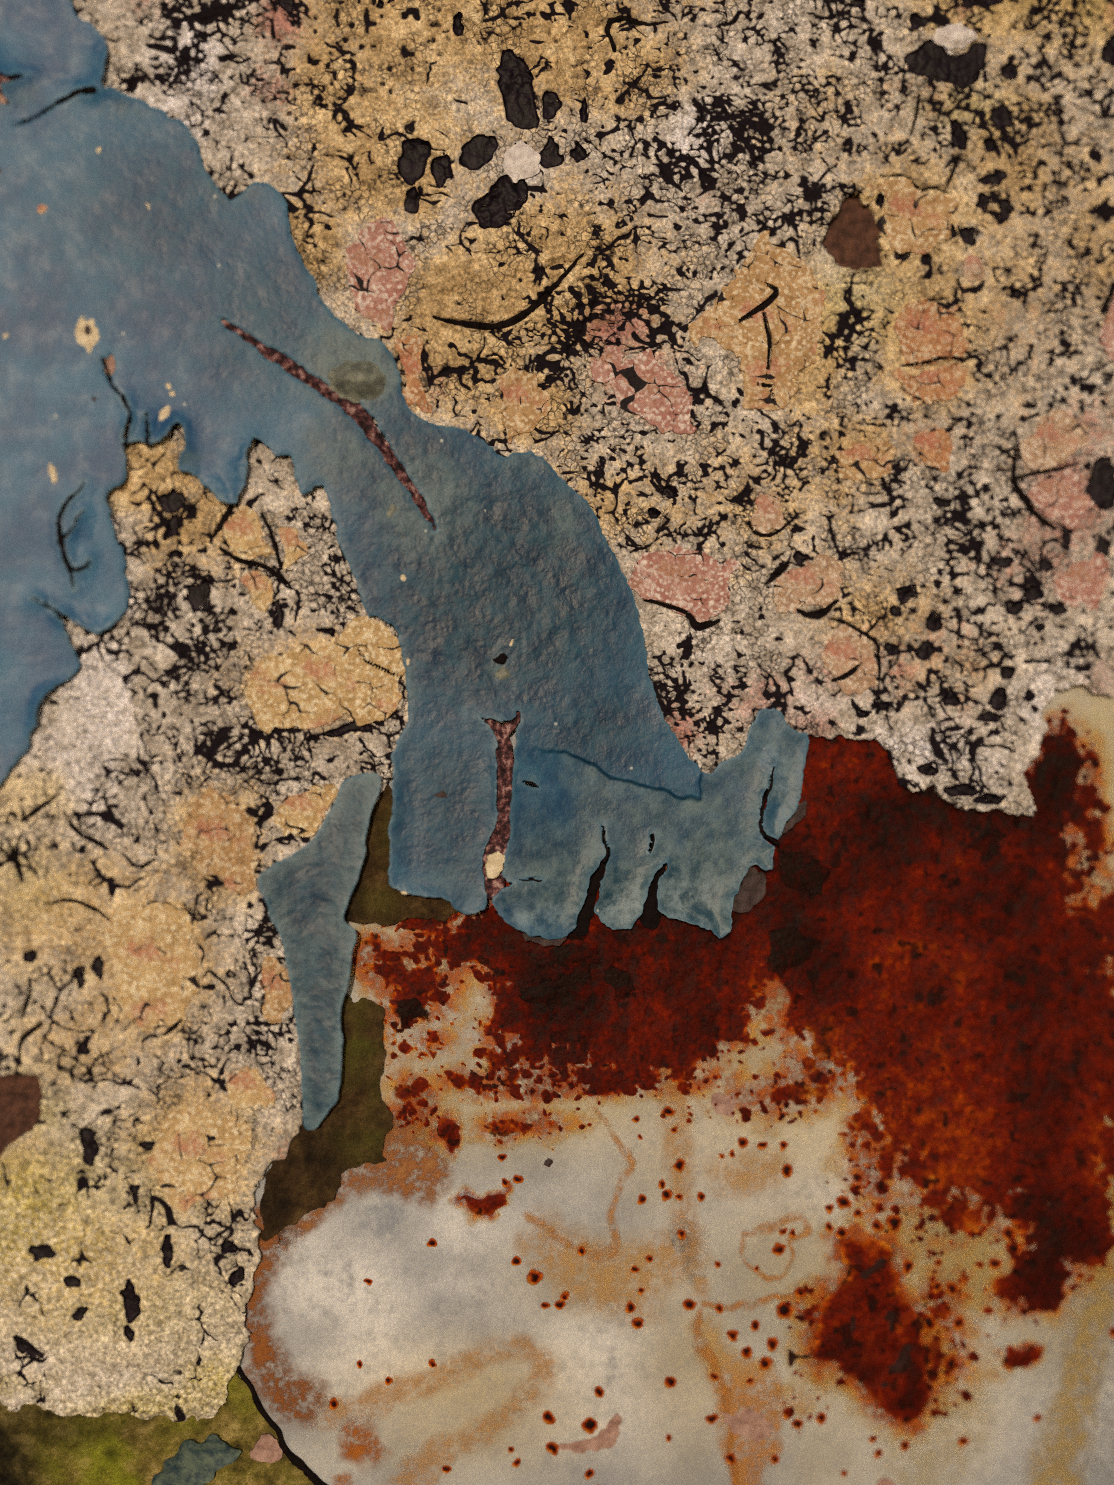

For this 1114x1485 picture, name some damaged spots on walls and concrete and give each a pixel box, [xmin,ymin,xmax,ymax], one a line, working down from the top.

crack [432,253,585,330]
crack [739,285,778,401]
crack [221,319,436,531]
peeling [71,0,1114,817]
crack [211,504,292,589]
crack [643,599,720,631]
crack [796,599,882,691]
peeling [0,0,810,1422]
crack [481,711,542,899]
rust [244,704,1114,1459]
rust [336,1425,381,1485]
rust [725,1453,736,1465]